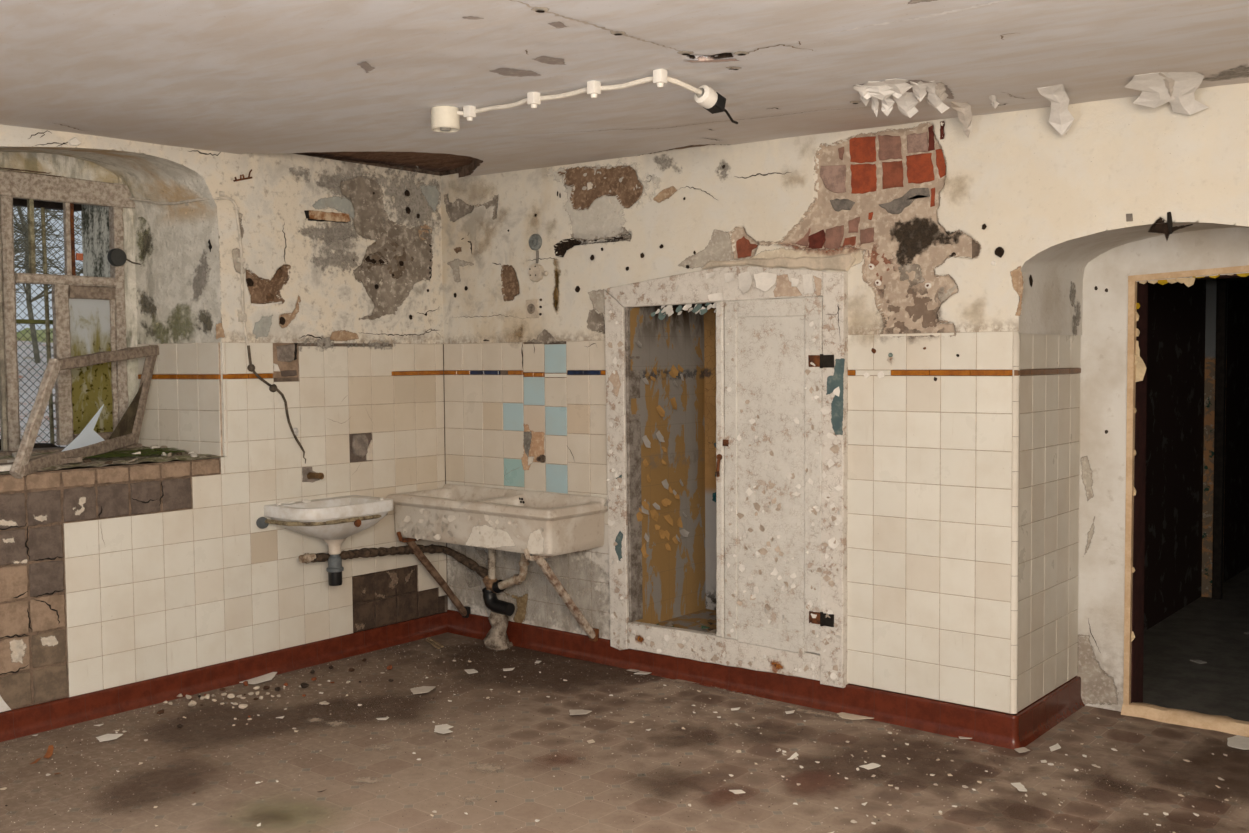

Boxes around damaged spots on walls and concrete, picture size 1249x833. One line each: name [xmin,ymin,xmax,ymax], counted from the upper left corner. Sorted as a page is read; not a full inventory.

crack [510,0,681,52]
peeling [1037,84,1074,135]
peeling [1125,72,1209,115]
spalling [232,213,301,328]
spalling [287,152,483,341]
spalling [501,264,520,301]
spalling [549,161,685,260]
spalling [651,79,1004,362]
spalling [1010,266,1033,316]
peeling [272,343,298,378]
peeling [352,565,445,633]